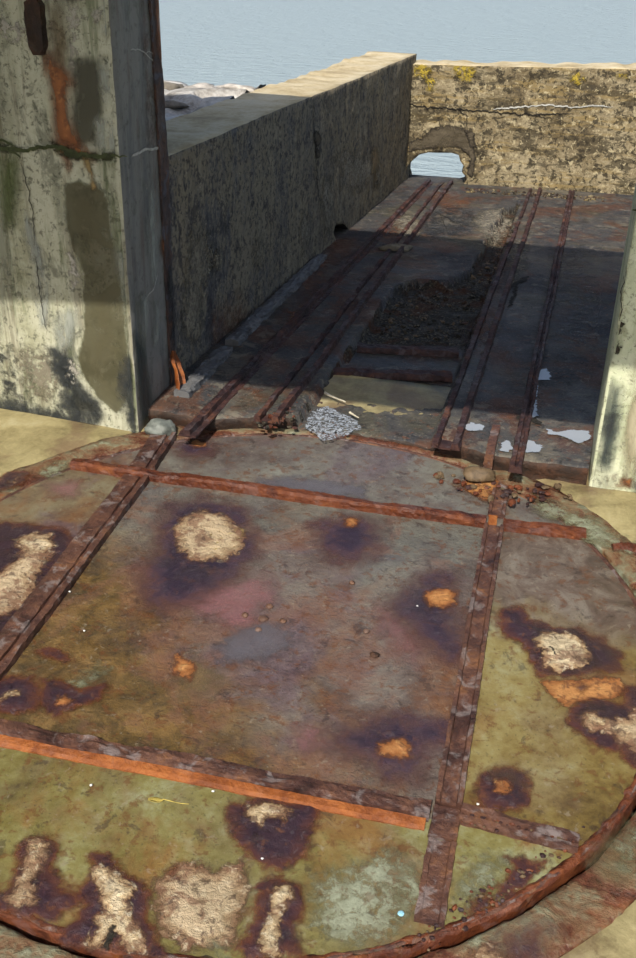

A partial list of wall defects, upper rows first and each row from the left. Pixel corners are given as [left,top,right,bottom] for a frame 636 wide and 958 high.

corrosion [43,54,97,190]
spalling [409,124,478,177]
crack [409,103,611,126]
crack [0,138,158,335]
damp [0,181,153,433]
damp [599,388,636,473]
corrosion [389,570,462,663]
corrosion [0,675,107,717]
corrosion [172,653,209,691]
corrosion [224,606,636,958]
corrosion [0,835,213,958]
peeling [150,854,251,953]